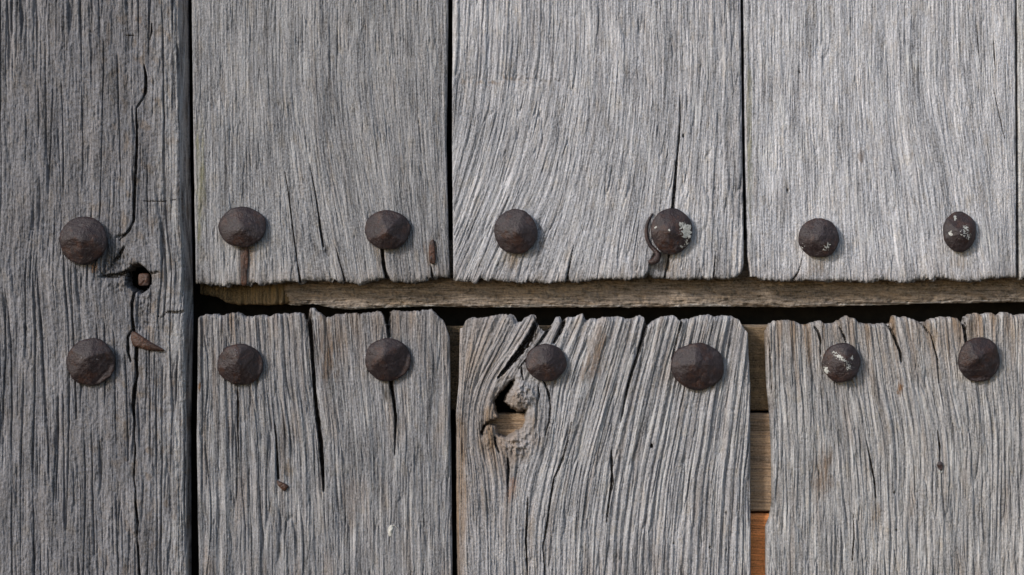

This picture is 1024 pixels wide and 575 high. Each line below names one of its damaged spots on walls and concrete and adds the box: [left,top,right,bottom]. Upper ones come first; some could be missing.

crack [671,101,681,208]
crack [99,66,183,575]
crack [307,312,325,490]
crack [494,322,572,575]